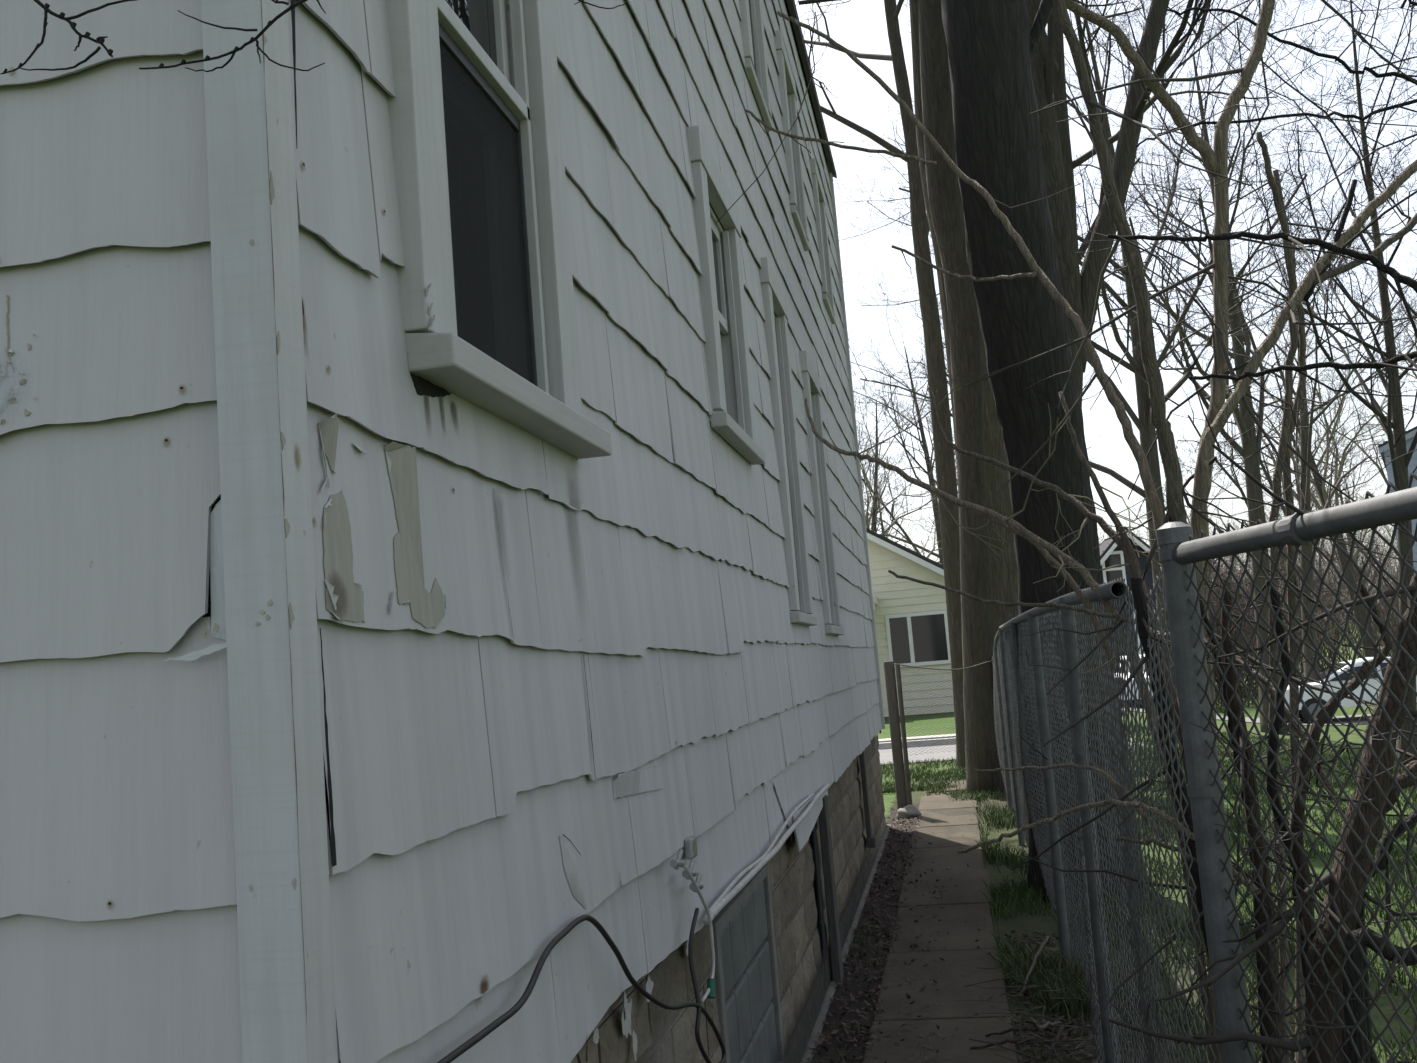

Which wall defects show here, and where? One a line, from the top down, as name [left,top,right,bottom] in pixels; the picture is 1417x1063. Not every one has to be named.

peeling [318,414,366,623]
peeling [384,442,449,628]